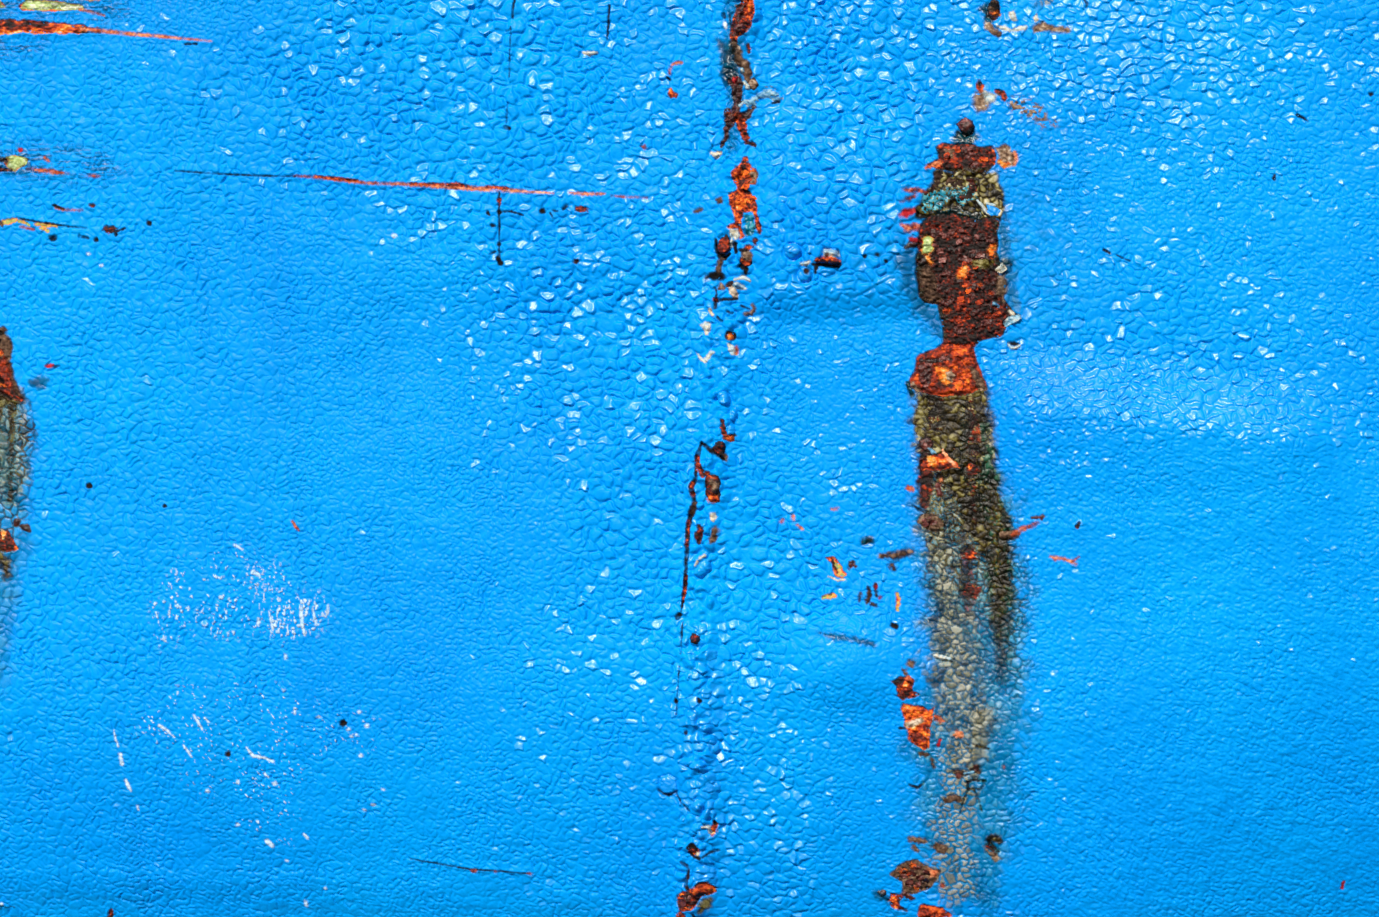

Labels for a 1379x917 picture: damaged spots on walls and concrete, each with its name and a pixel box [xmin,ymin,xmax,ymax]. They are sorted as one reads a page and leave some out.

rust [694,0,761,250]
rust [915,143,1021,347]
rust [0,326,35,578]
rust [694,524,704,544]
rust [720,419,737,442]
rust [876,389,1014,917]
rust [686,843,701,860]
rust [676,882,717,917]